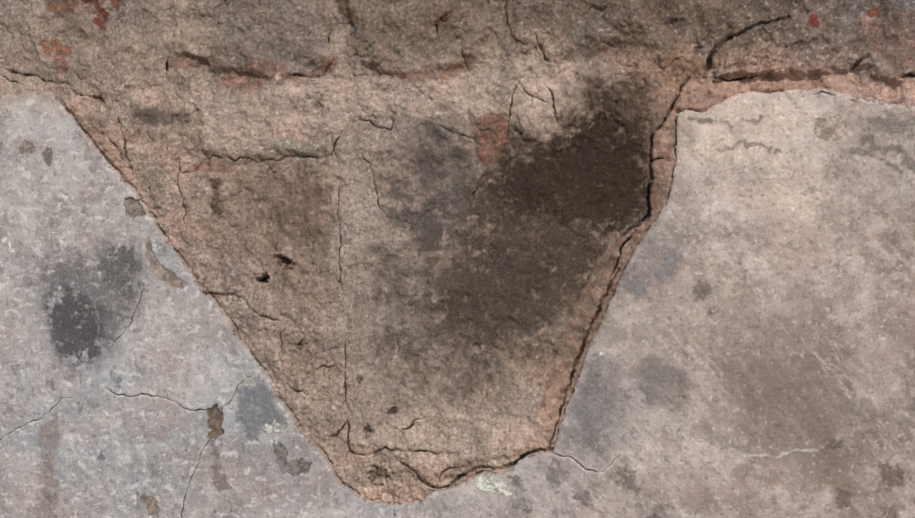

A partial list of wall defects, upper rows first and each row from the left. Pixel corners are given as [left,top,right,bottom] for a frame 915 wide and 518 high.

flaking render [40,37,71,74]
flaking render [46,0,123,30]
flaking render [853,12,915,67]
flaking render [18,139,52,166]
crack [176,117,436,224]
flaking render [55,52,829,506]
crack [315,17,789,488]
crack [210,292,303,365]
crack [106,388,207,411]
crack [729,448,815,458]